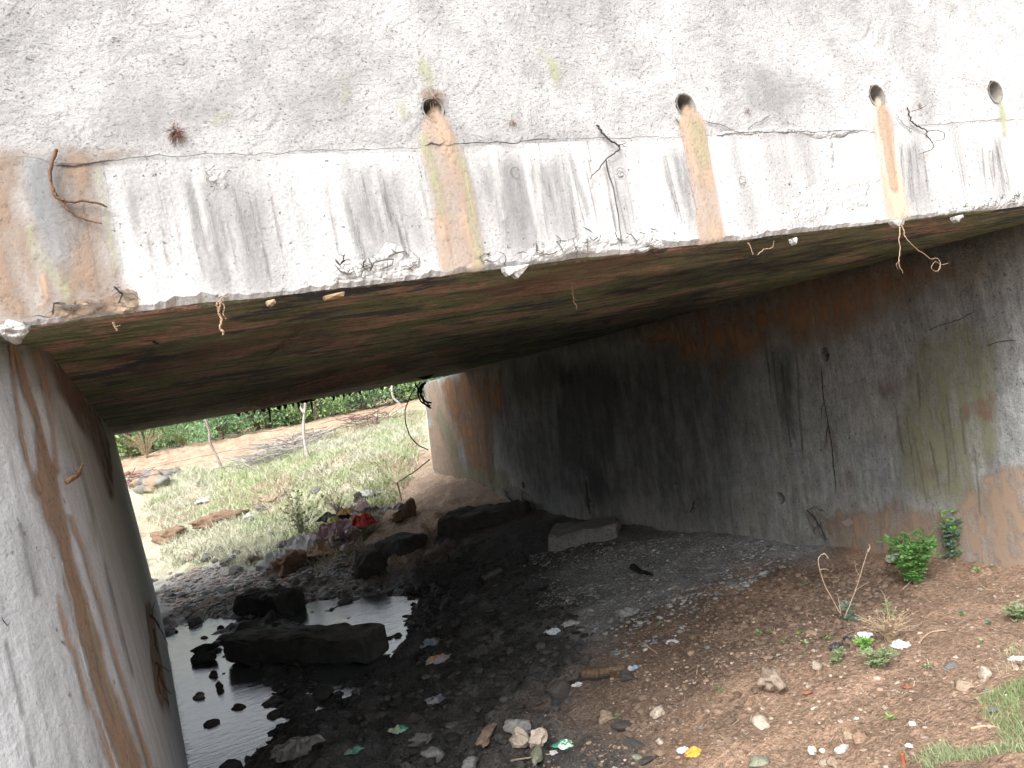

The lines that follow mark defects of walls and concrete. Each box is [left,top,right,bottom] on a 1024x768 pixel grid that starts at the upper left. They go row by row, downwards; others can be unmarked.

crack [12,118,680,167]
crack [896,115,1014,128]
spalling [323,241,420,301]
damp [345,182,406,258]
spalling [467,227,663,279]
rust [54,360,113,497]
crack [821,368,836,488]
rust [146,603,169,707]